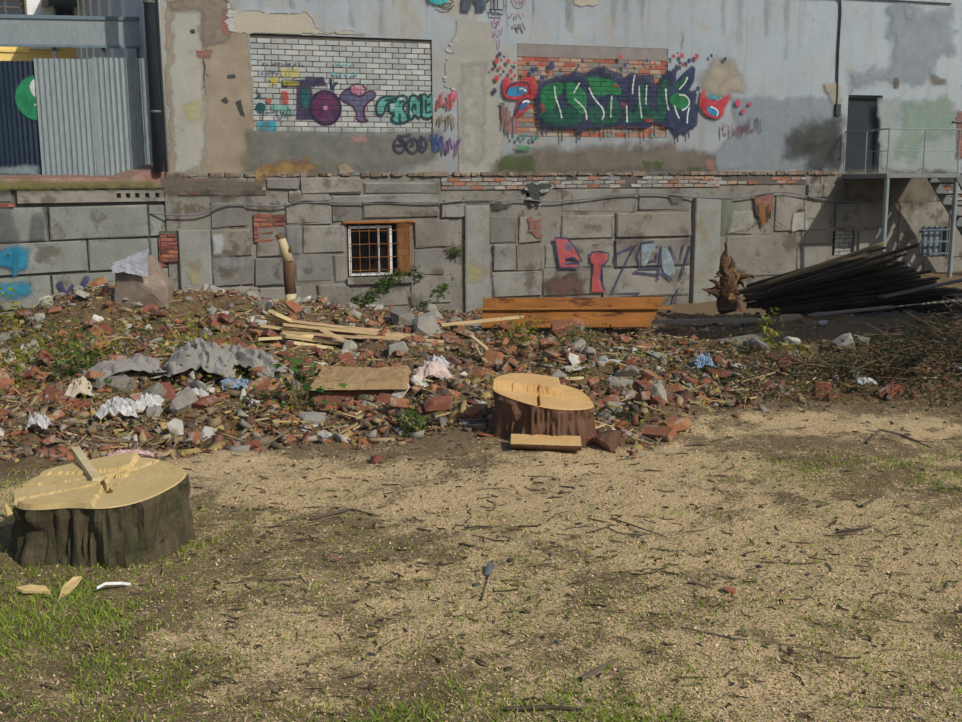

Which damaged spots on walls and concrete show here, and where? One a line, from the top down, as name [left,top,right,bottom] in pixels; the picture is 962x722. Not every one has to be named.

flaking render [165,0,366,177]